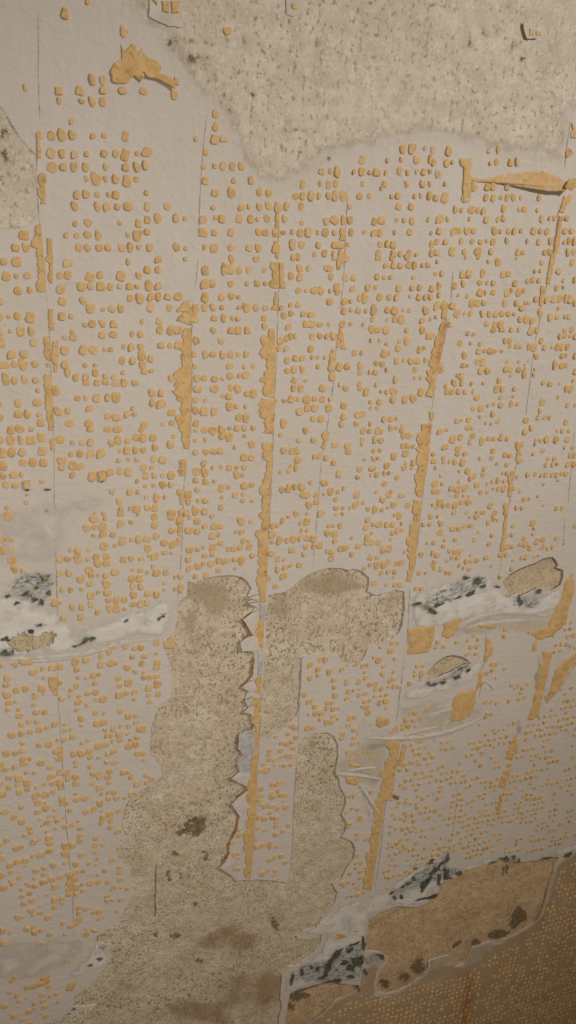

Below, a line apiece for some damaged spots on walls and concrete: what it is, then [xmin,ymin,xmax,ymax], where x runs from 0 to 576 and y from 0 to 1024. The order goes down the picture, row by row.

peeling [111,44,179,89]
peeling [523,23,539,39]
peeling [462,158,576,202]
water stain [539,196,571,306]
water stain [173,300,199,476]
water stain [426,304,449,398]
water stain [0,481,243,661]
water stain [406,411,562,634]
peeling [503,557,576,720]
peeling [46,568,462,1024]
water stain [154,741,576,1024]
peeling [335,857,558,993]